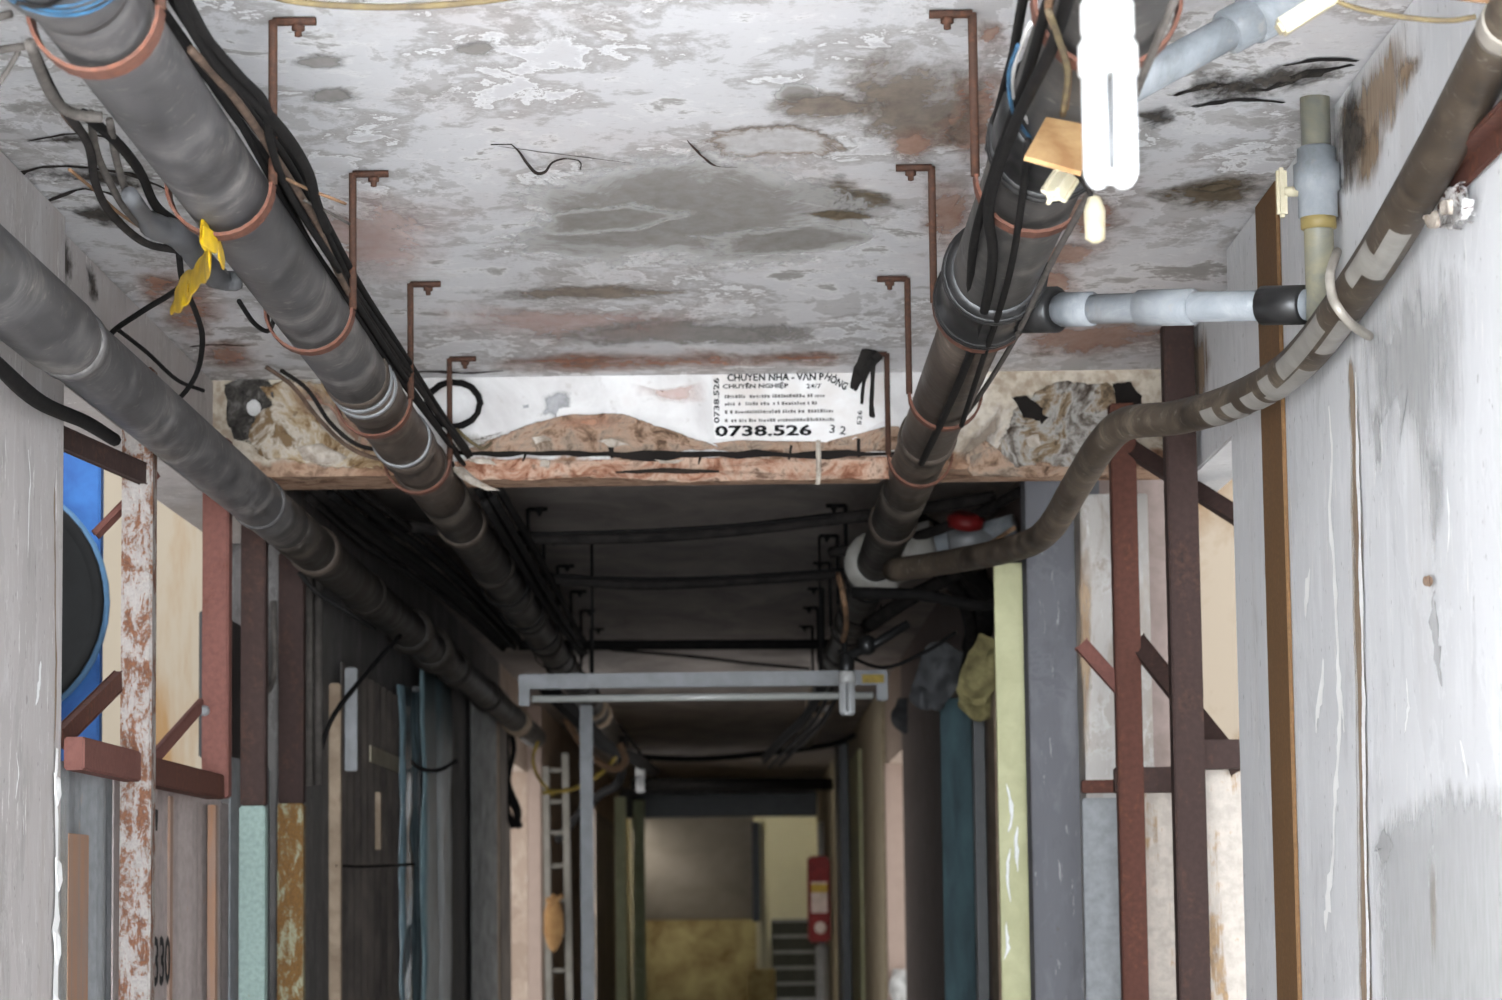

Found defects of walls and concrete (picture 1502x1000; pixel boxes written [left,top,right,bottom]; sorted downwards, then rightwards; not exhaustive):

water stain [776,56,970,148]
water stain [1138,109,1174,125]
water stain [1190,64,1331,99]
water stain [1340,88,1365,188]
water stain [509,152,890,267]
water stain [510,286,682,299]
spalling [245,379,384,469]
spalling [452,413,900,491]
spalling [965,381,1142,478]